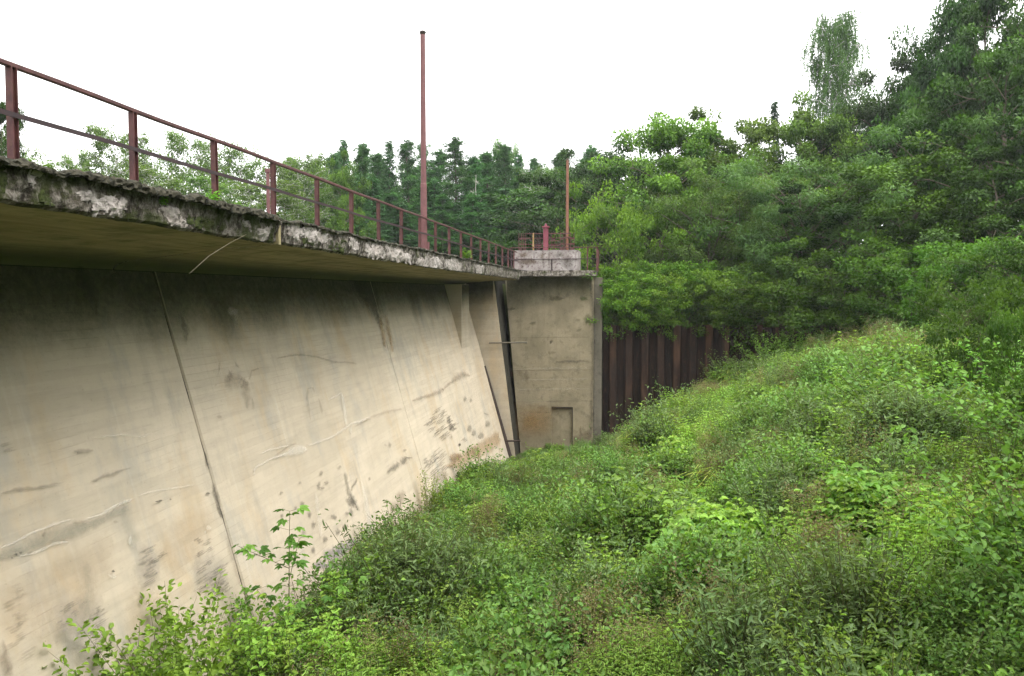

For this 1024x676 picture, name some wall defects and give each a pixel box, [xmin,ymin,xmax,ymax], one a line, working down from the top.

spalling [27,168,43,188]
spalling [76,190,130,218]
spalling [158,204,188,228]
spalling [242,219,273,242]
spalling [286,223,332,246]